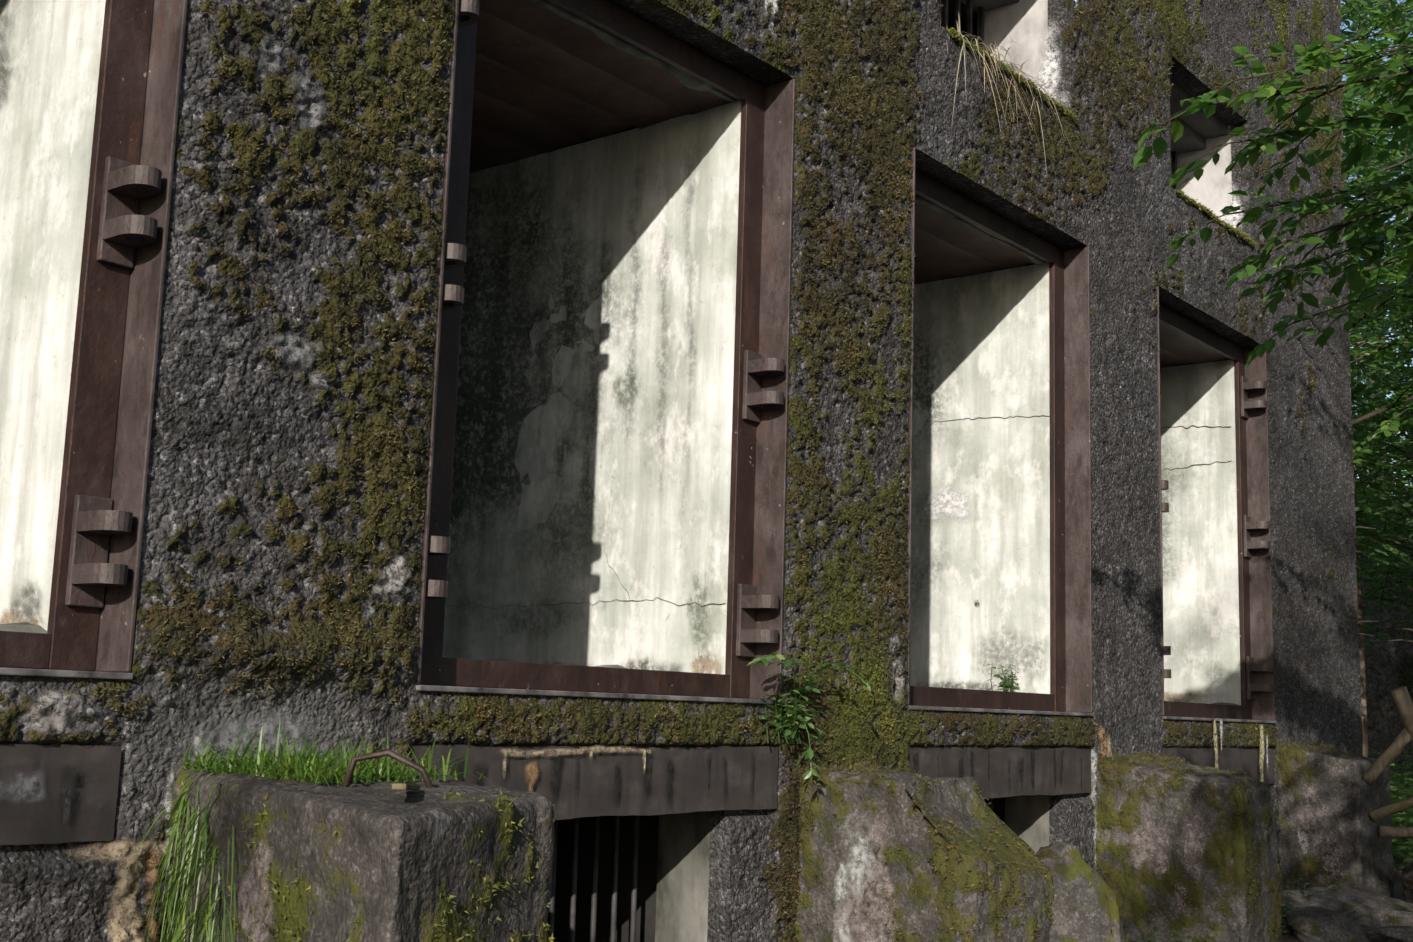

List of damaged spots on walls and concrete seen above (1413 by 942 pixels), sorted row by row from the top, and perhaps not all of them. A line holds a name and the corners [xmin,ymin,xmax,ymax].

crack [1161,425,1232,471]
crack [456,538,725,609]
rust [527,762,539,791]